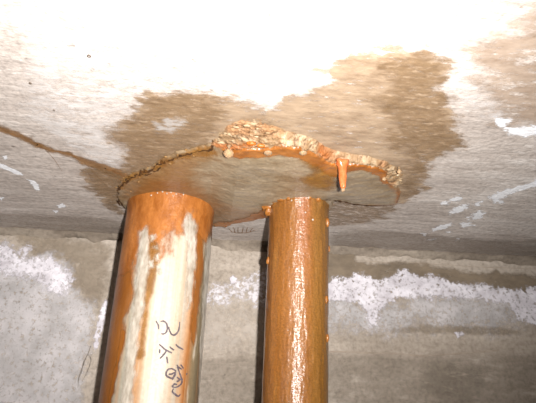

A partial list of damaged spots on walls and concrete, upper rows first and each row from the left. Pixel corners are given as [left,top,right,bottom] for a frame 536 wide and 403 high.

efflorescence [0,156,40,190]
crack [0,126,216,208]
water stain [28,20,477,225]
corrosion [233,146,339,188]
spalling [210,119,404,188]
corrosion [347,163,388,184]
efflorescence [0,242,108,403]
water stain [328,253,536,338]